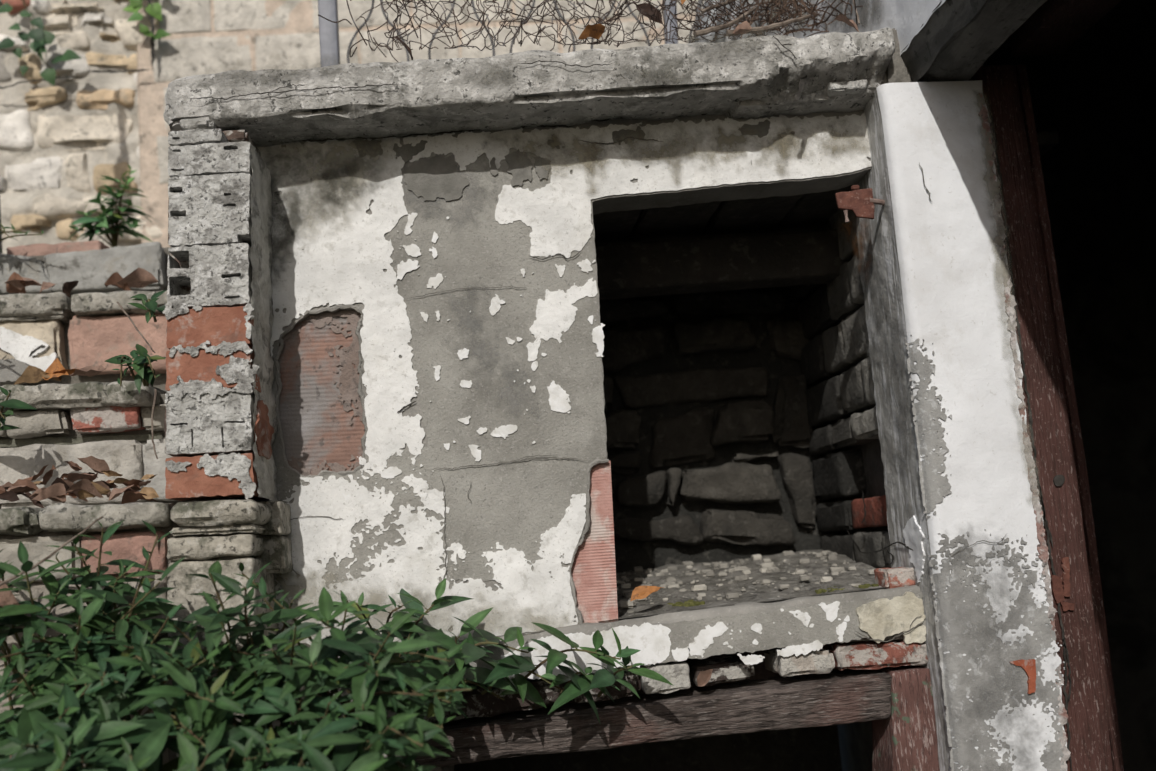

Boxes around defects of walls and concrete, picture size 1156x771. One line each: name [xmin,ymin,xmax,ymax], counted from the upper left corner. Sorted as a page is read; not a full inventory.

peeling [253,93,1071,771]